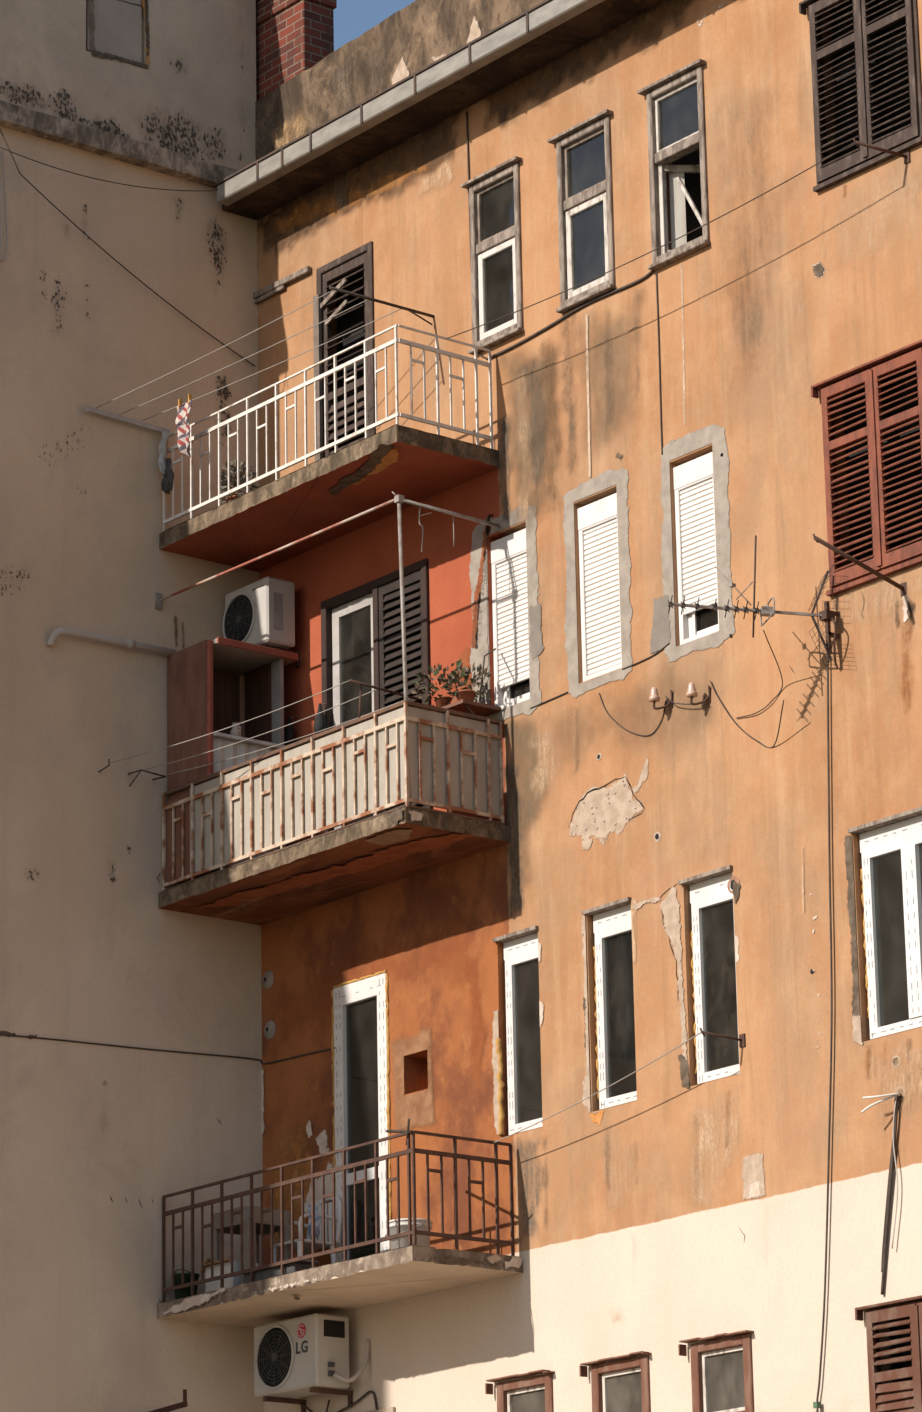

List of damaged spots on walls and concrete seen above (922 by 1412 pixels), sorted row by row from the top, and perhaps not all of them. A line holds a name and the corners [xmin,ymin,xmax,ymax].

damp [487,0,724,126]
damp [0,81,306,161]
flaking render [569,757,649,850]
flaking render [581,915,607,1125]
flaking render [631,883,689,1088]
peeling [163,1287,225,1315]
spalling [434,1254,523,1269]